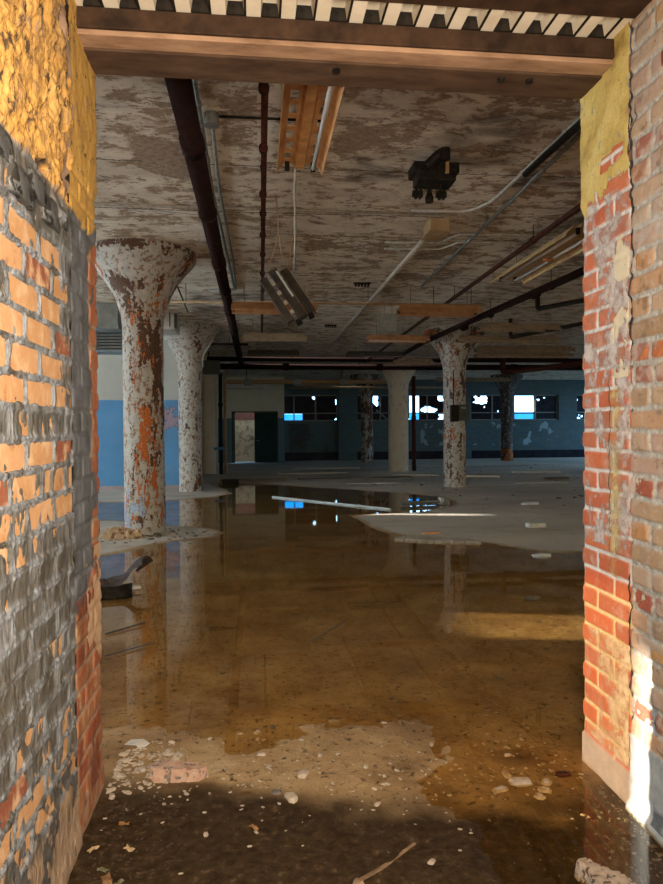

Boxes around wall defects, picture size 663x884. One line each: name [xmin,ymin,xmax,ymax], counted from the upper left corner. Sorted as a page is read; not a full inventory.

flaking render [39,99,74,196]
peeling [96,91,193,192]
peeling [216,88,257,146]
peeling [333,102,435,161]
peeling [297,233,403,272]
peeling [580,22,663,467]
crack [608,75,638,552]
peeling [90,217,215,529]
peeling [350,362,388,462]
peeling [421,420,466,487]
peeling [491,375,557,450]
peeling [586,478,653,547]